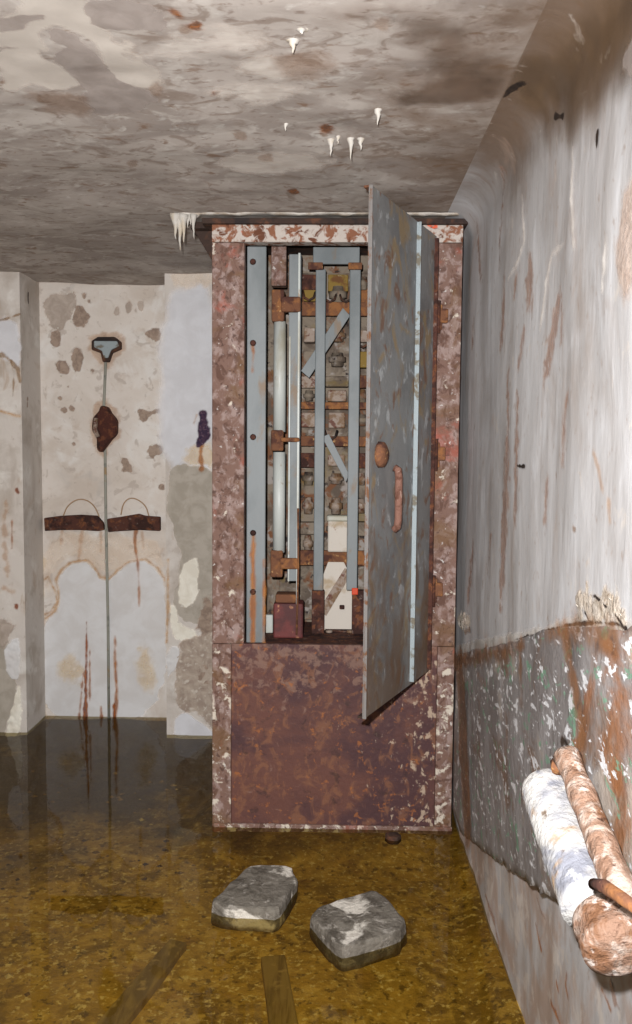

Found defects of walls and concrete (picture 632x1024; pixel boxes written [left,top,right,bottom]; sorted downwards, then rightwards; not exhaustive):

damp [169,212,368,250]
rust [78,622,118,720]
damp [44,560,169,721]
spalling [159,464,212,738]
rust [454,640,522,847]
rust [549,620,616,761]